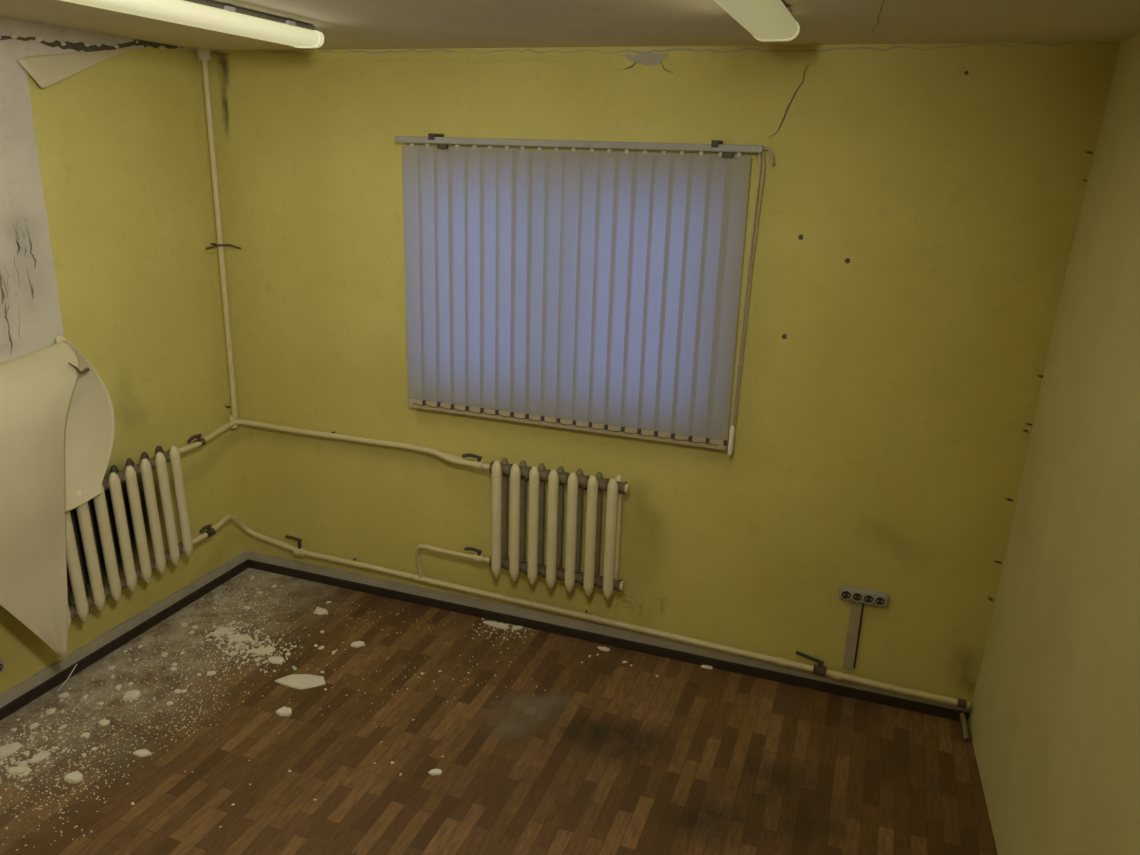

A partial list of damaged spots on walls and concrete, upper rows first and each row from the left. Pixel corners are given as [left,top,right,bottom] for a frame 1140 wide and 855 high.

crack [0,35,231,55]
crack [269,0,1108,138]
flaking render [0,17,195,364]